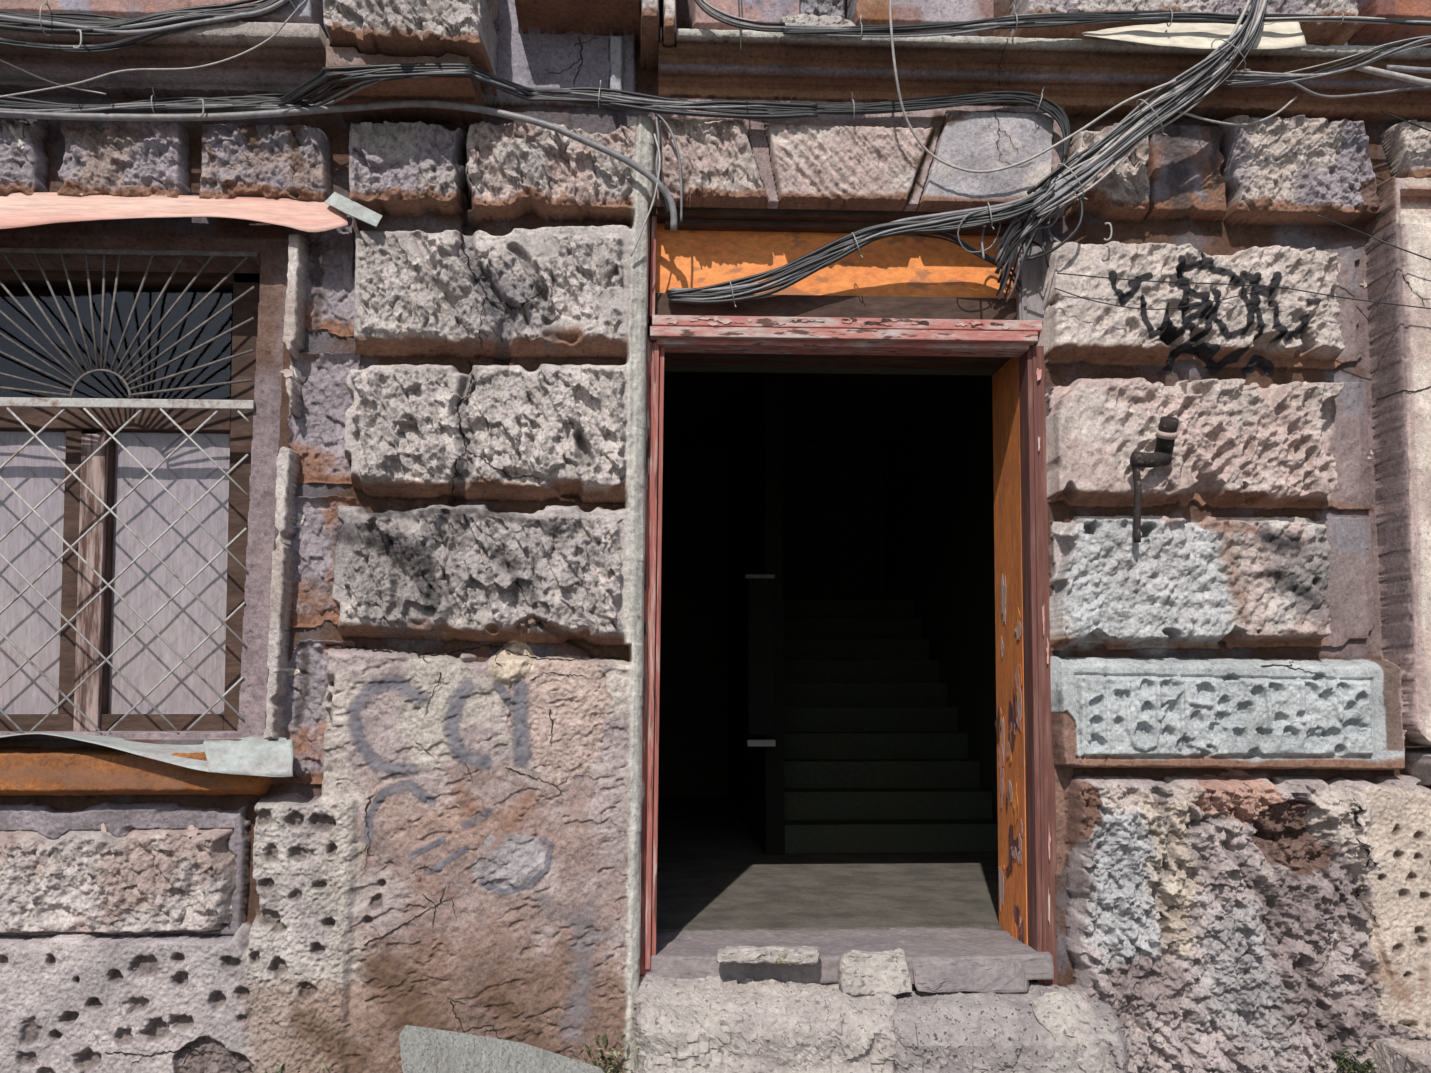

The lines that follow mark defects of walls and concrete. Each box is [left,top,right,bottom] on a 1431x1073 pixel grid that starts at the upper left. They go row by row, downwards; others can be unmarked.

crack [546,35,592,87]
peeling [667,316,752,326]
peeling [776,318,929,326]
peeling [955,320,1010,329]
peeling [995,574,1024,944]
spalling [1048,708,1104,924]
spalling [1194,767,1339,876]
spalling [172,1035,256,1073]